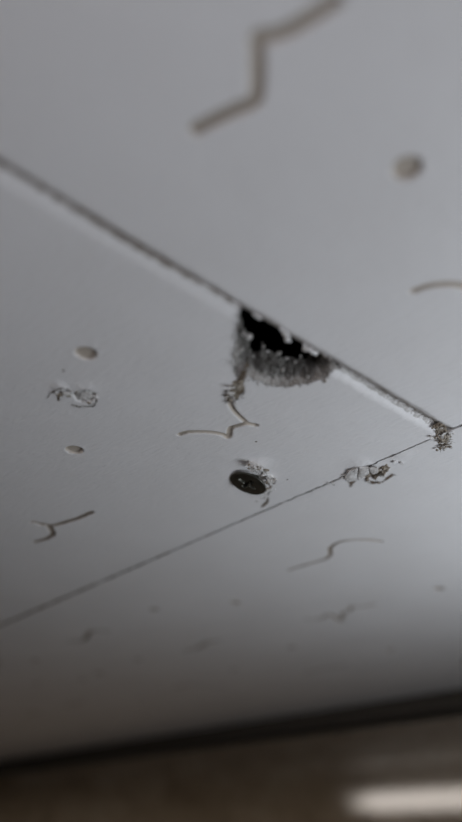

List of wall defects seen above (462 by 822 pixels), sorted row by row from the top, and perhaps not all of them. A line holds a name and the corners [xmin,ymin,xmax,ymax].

hole [229,307,343,389]
spalling [47,387,99,408]
crack [222,360,250,427]
flaking render [430,422,455,453]
peeling [246,460,277,507]
spalling [327,461,403,487]